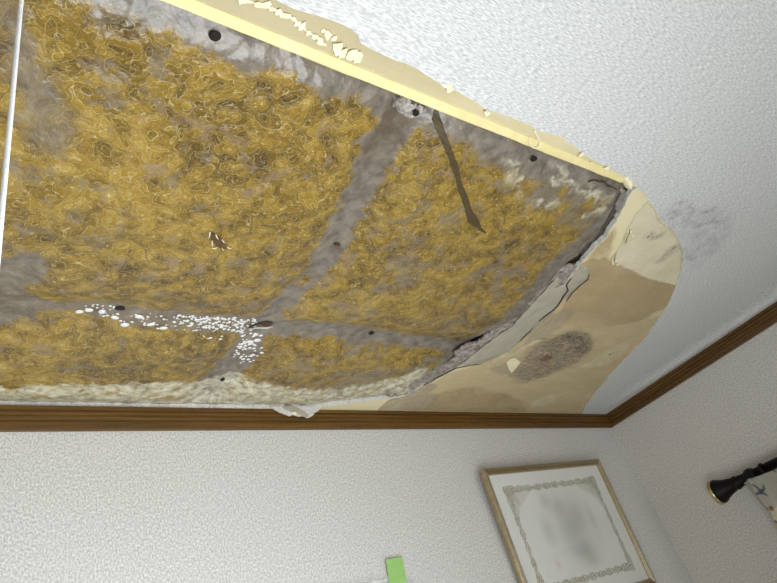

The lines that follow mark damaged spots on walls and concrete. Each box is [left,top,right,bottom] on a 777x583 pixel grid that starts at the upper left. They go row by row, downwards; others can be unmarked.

peeling [238,0,363,63]
spalling [386,257,590,401]
leakage [401,235,675,413]